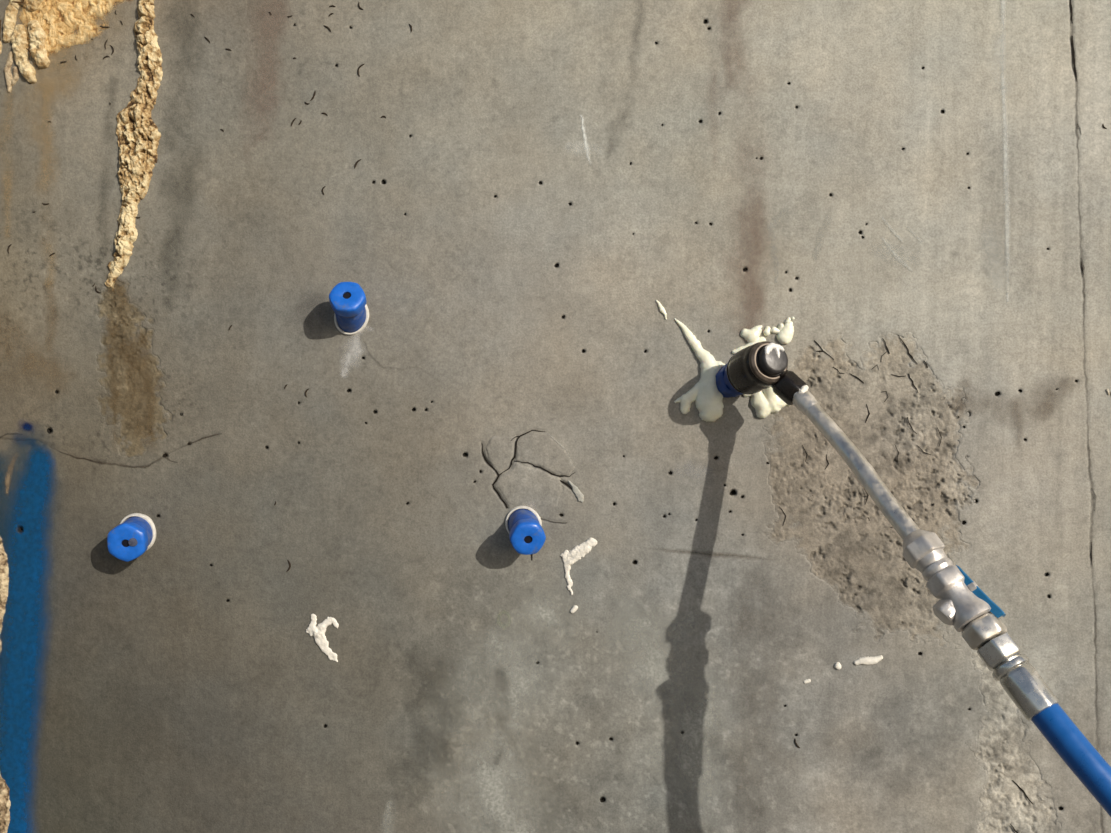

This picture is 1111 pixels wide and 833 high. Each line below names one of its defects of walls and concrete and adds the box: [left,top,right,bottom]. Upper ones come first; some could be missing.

crack [1070,0,1081,151]
crack [482,430,584,523]
spalling [787,330,980,560]
spalling [762,404,1061,833]
crack [1091,602,1099,707]